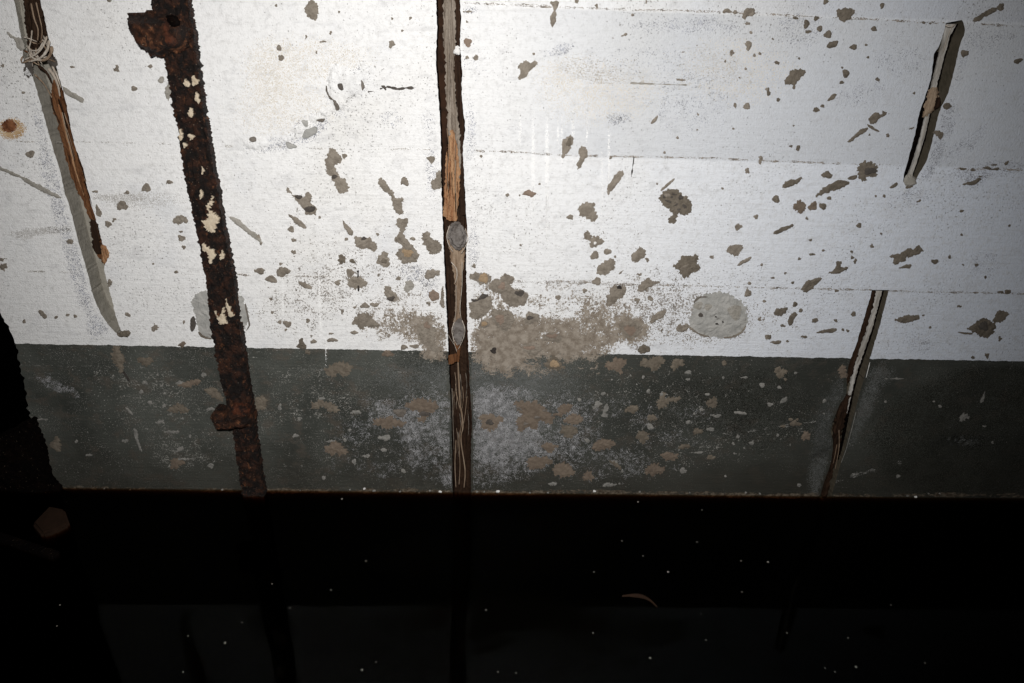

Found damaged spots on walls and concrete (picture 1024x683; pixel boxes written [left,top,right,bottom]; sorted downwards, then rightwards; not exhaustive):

spalling [453,38,478,61]
rust [0,117,27,140]
spalling [92,183,151,228]
peeling [468,183,857,483]
efflorescence [321,357,452,489]
leakage [470,355,843,501]